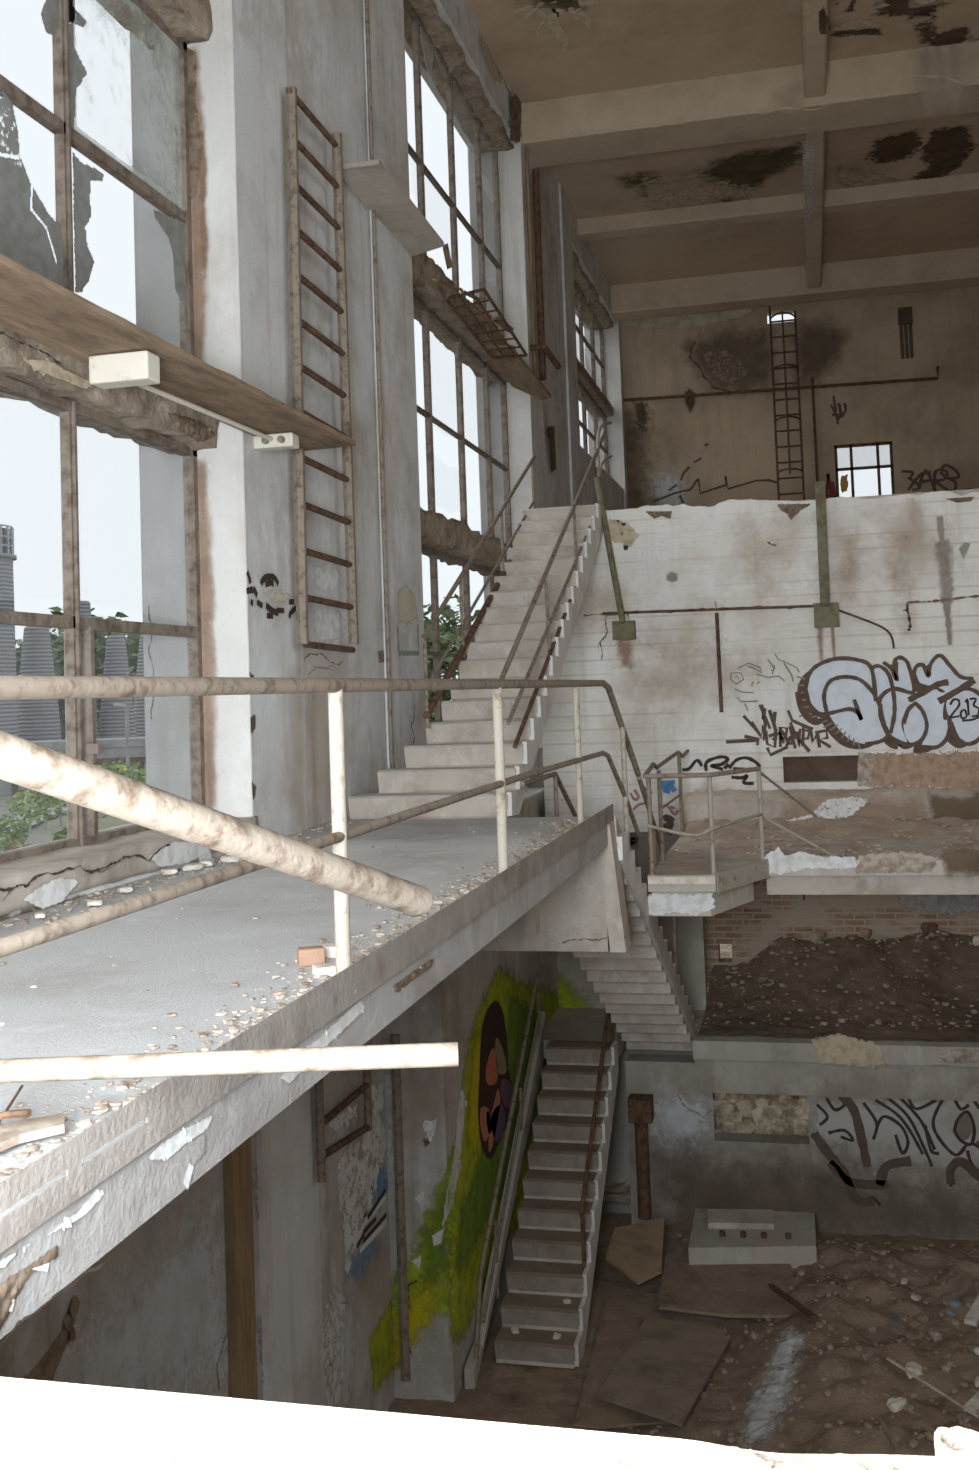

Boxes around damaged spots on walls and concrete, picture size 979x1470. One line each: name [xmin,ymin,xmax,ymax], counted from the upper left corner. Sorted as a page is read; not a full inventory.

leakage [509,0,595,54]
leakage [831,0,979,47]
leakage [703,145,803,203]
leakage [864,125,977,180]
leakage [696,334,769,390]
crack [0,844,170,900]
spalling [0,1189,104,1329]
peeling [24,1295,80,1381]